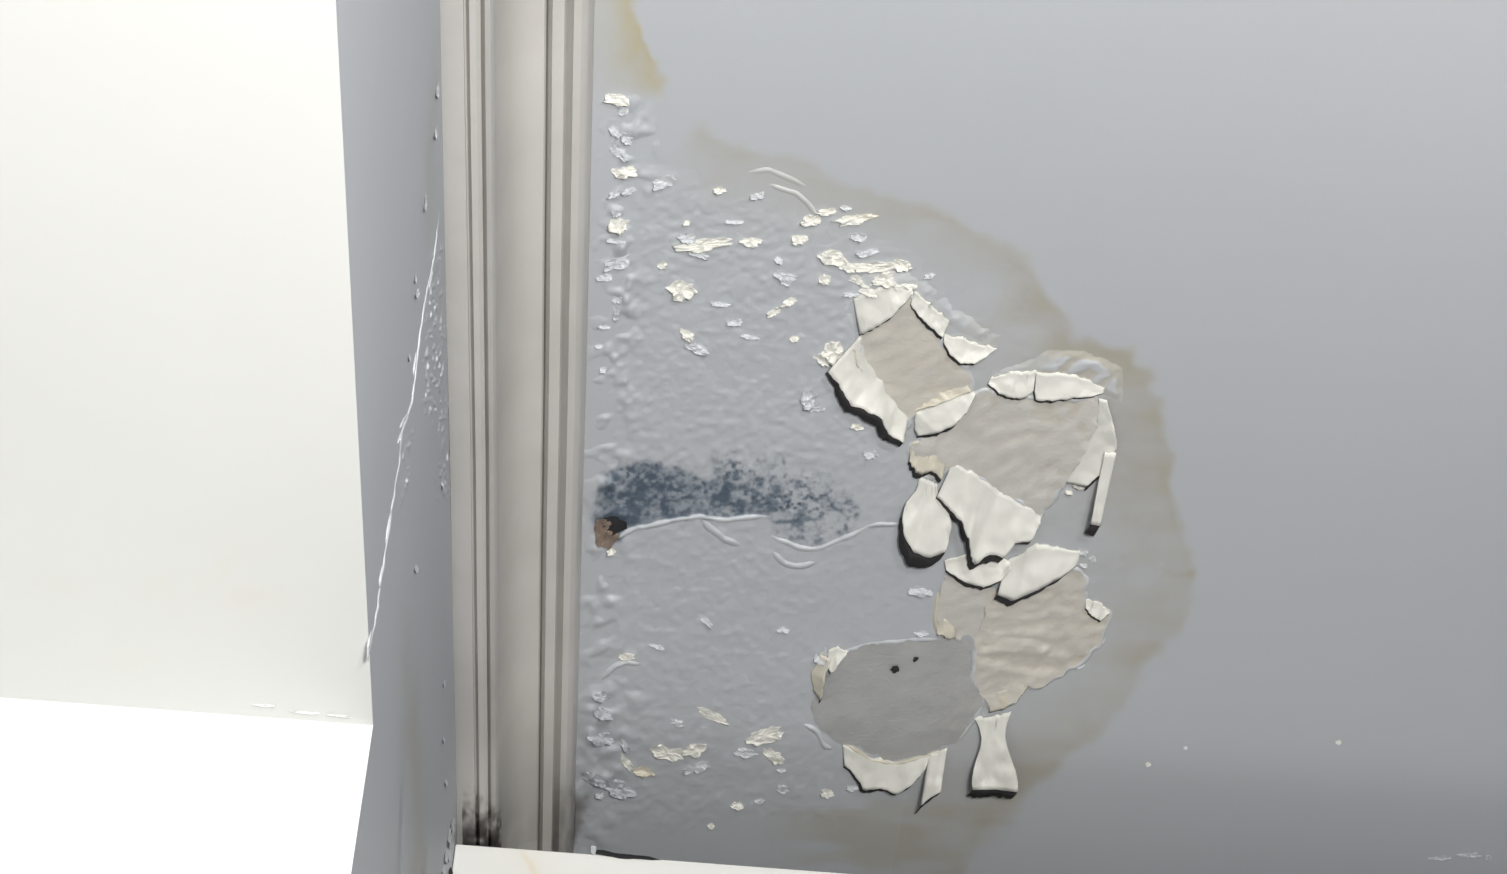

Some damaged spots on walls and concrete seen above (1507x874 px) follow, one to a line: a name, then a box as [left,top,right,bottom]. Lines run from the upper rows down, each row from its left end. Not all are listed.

crack [367,218,439,661]
water stain [594,469,899,570]
peeling [804,272,1123,814]